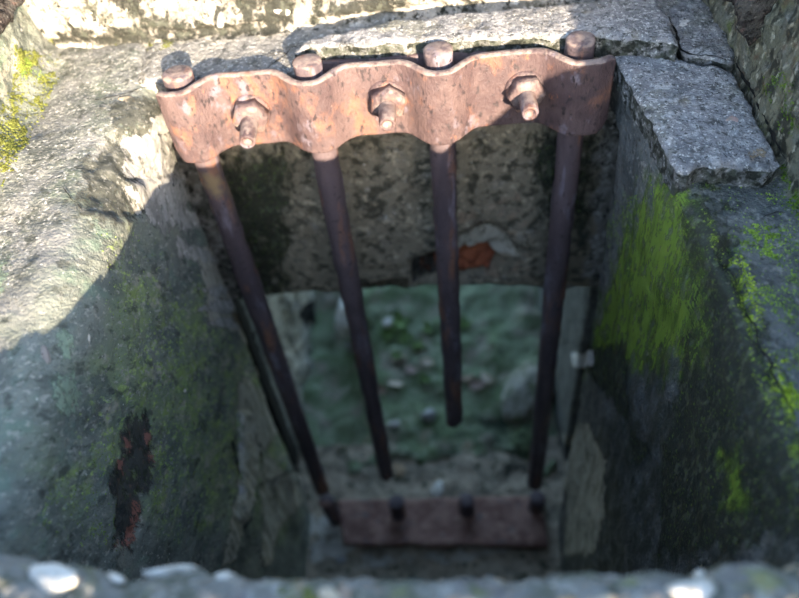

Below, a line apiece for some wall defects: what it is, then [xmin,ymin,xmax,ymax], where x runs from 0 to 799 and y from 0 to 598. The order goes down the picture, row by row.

crack [668,16,786,159]
spalling [108,409,156,553]
water stain [587,339,649,482]
water stain [657,182,799,562]
crack [725,269,798,426]